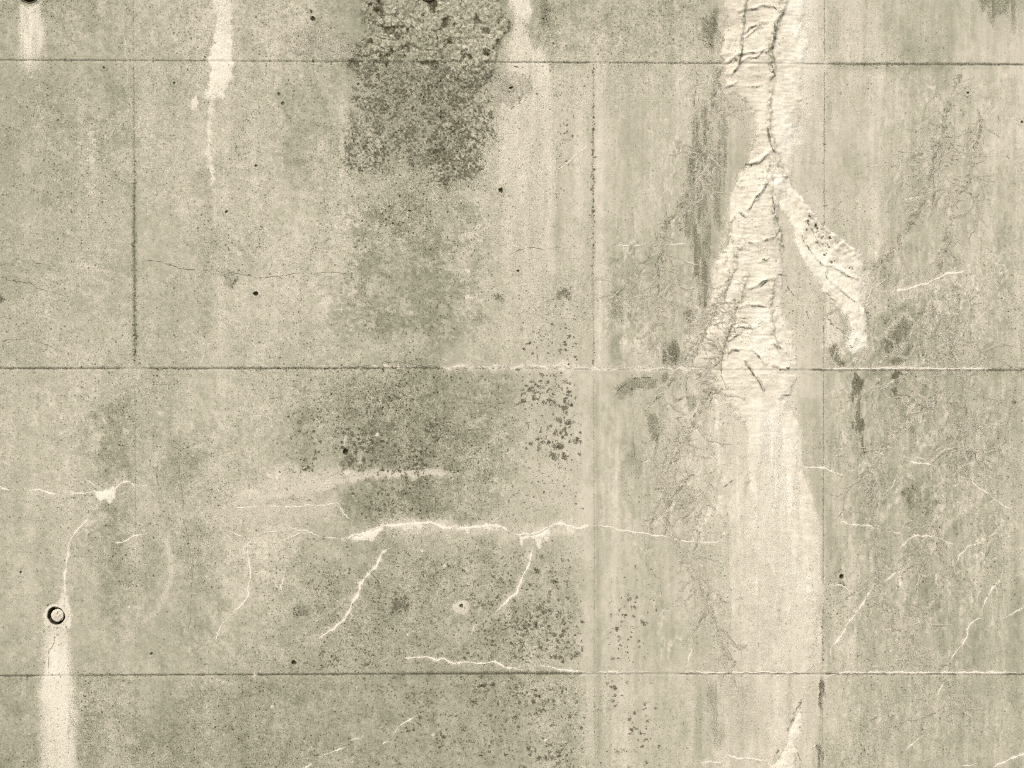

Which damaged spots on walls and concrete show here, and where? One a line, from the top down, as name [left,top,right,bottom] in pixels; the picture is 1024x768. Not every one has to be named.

leakage [14,1,48,90]
leakage [190,0,236,230]
crack [878,267,968,295]
leakage [32,589,81,768]
crack [0,443,193,628]
crack [215,433,721,640]
crack [378,520,1023,708]
leakage [662,0,916,768]
crack [800,464,845,476]
crack [874,451,1013,511]